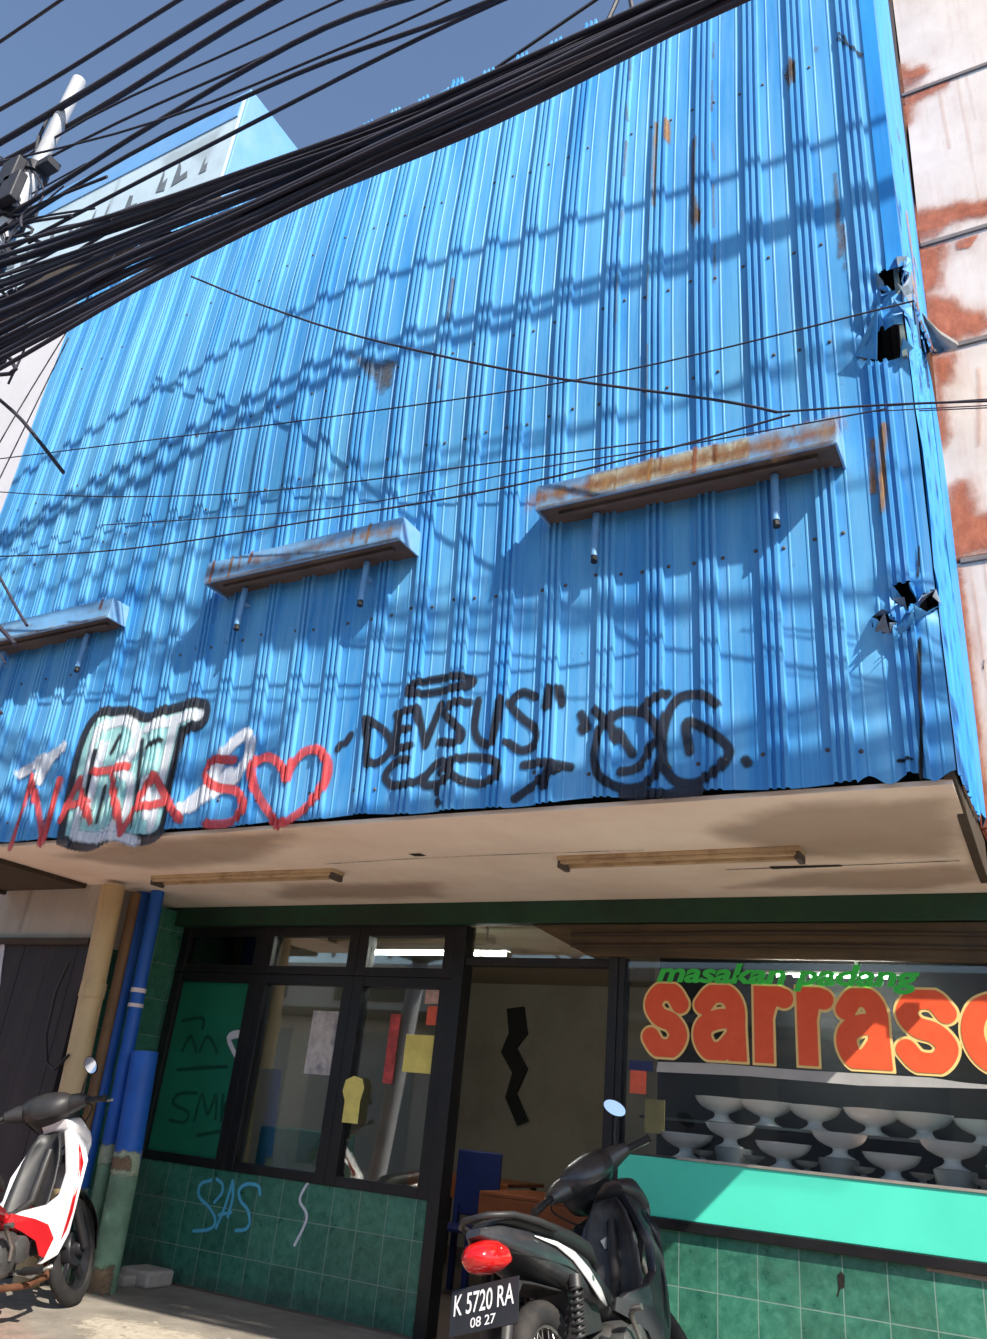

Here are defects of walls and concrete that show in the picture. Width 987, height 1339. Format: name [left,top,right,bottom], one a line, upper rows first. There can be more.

rust [786,58,795,88]
rust [650,118,670,205]
rust [897,67,950,173]
peeling [856,256,914,360]
rust [900,201,987,443]
rust [536,420,838,509]
rust [871,423,887,509]
peeling [871,582,941,636]
rust [949,481,987,816]
peeling [97,1143,141,1177]
peeling [86,1265,115,1295]
spalling [72,1315,211,1339]